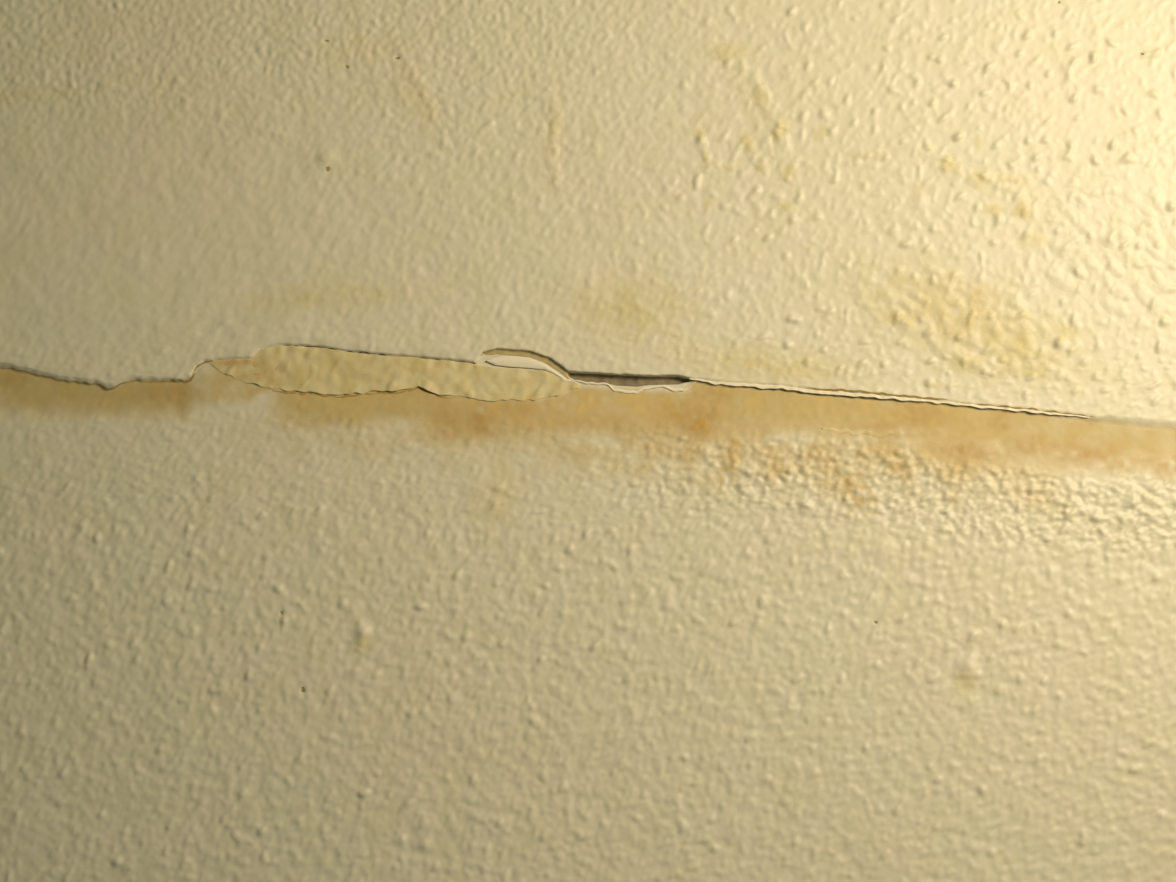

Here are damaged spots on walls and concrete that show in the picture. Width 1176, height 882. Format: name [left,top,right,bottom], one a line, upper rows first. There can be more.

crack [1,359,223,391]
crack [273,387,447,398]
crack [284,345,693,387]
water stain [426,389,708,438]
spalling [206,346,1176,455]
crack [810,387,1090,417]